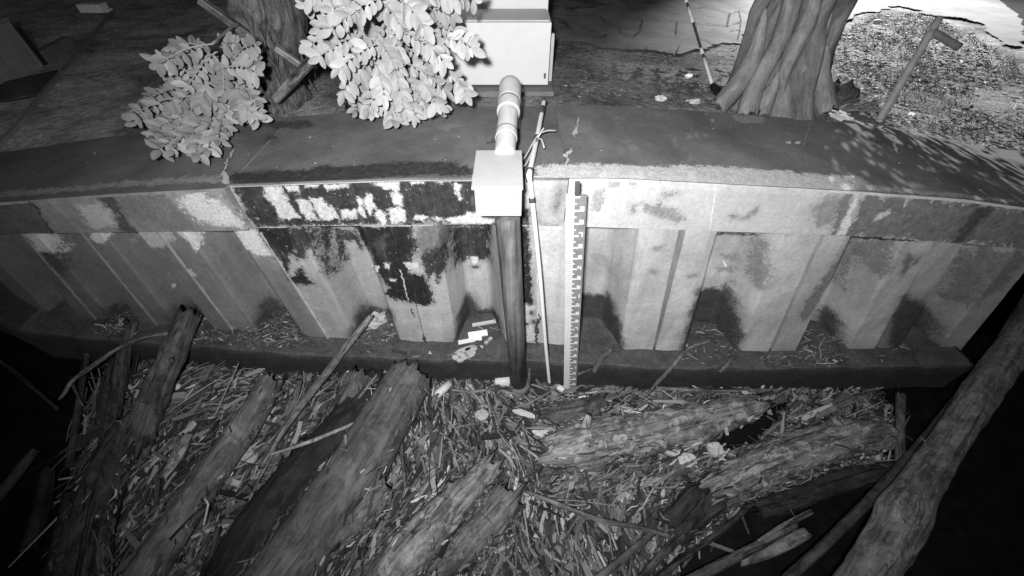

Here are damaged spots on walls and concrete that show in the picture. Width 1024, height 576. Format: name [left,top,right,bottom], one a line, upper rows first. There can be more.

water stain [97,194,190,232]
crack [220,149,235,184]
water stain [230,160,495,335]
water stain [681,236,774,351]
water stain [799,193,1024,349]